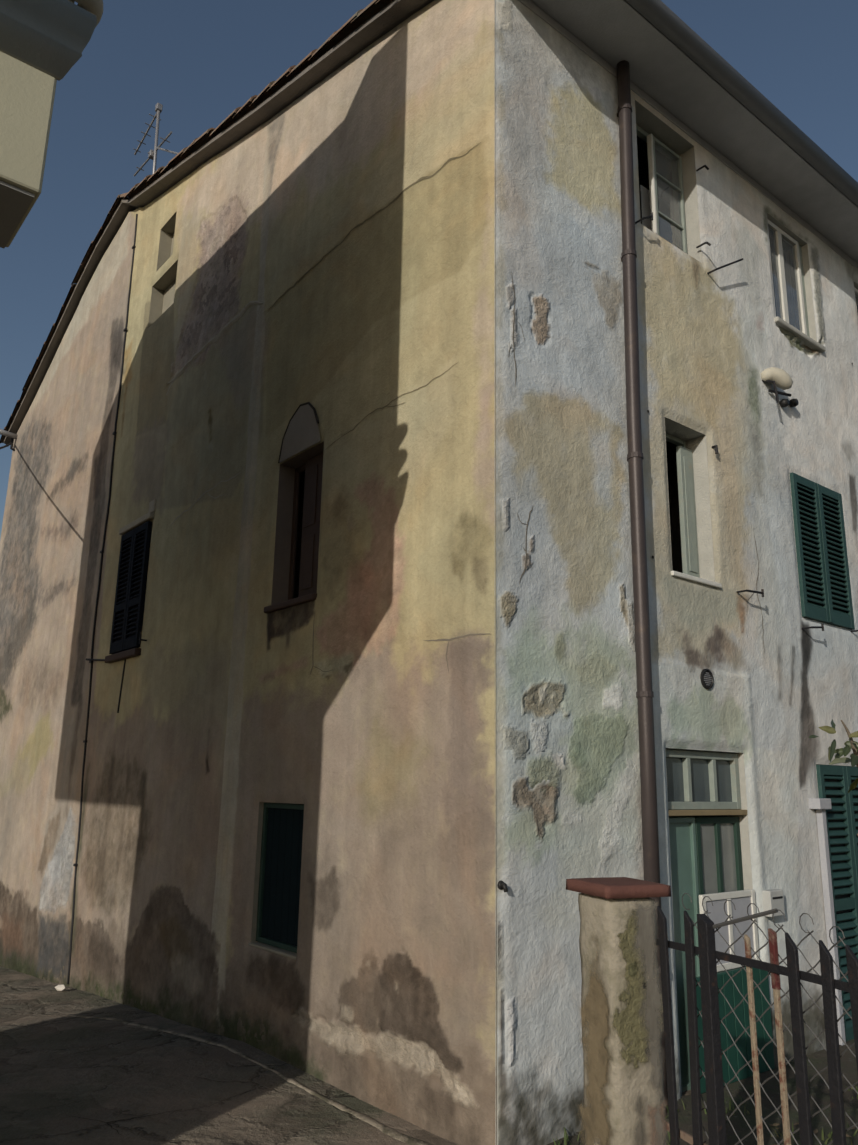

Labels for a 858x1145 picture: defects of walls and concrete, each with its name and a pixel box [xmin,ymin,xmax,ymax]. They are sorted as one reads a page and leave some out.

crack [508,272,525,387]
flaking render [503,281,551,354]
crack [325,363,457,450]
crack [517,504,534,585]
crack [747,531,764,644]
leakage [671,619,755,682]
leakage [0,313,611,1145]
flaking render [500,677,587,843]
peeling [591,748,644,880]
flaking render [291,1000,481,1113]
leakage [635,902,682,1101]
leakage [769,962,826,1067]